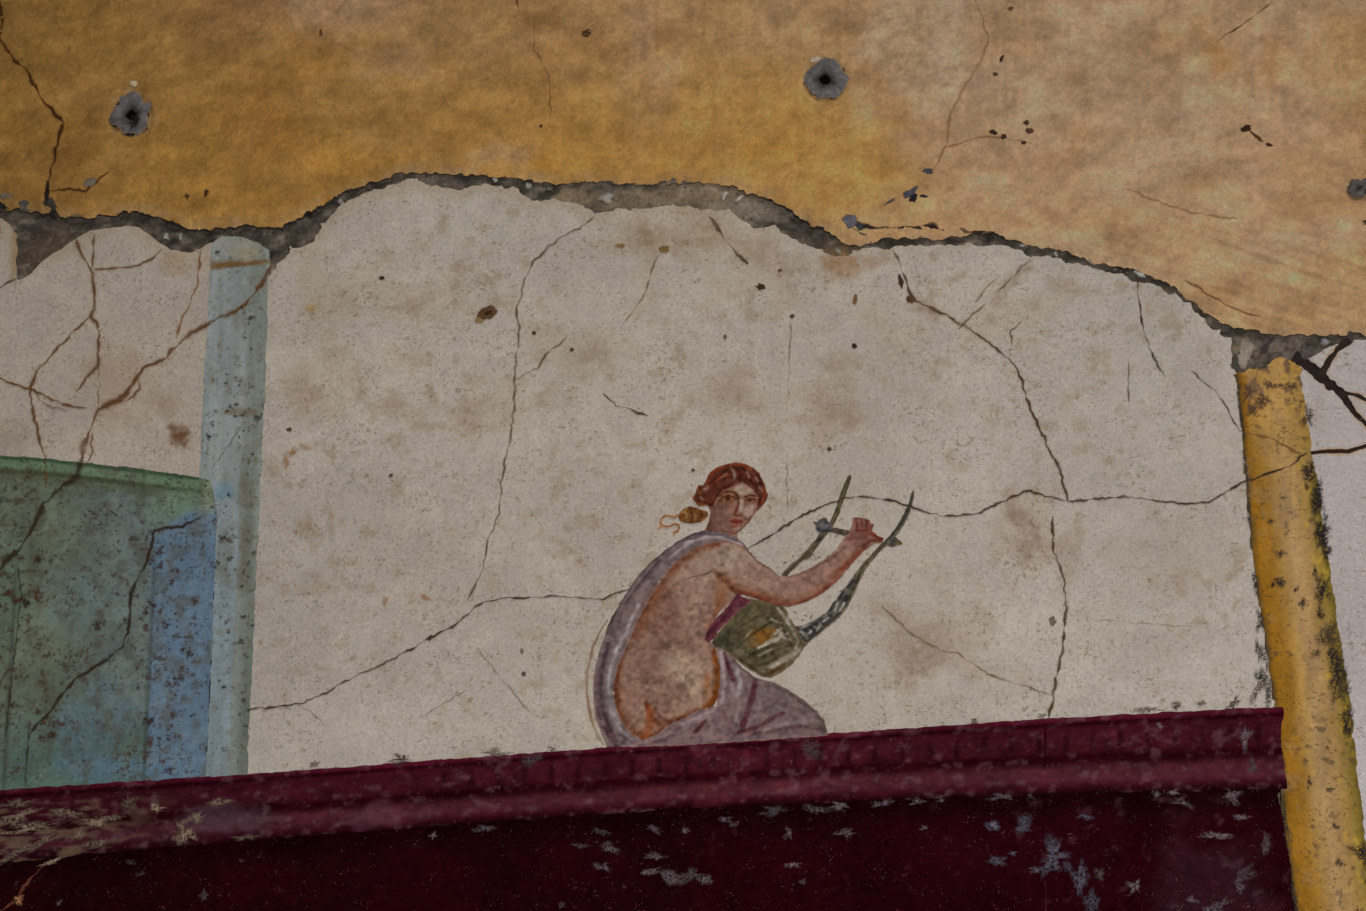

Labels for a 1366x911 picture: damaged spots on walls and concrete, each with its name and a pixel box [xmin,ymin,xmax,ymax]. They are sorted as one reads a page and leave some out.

crack [0,2,109,192]
flaking render [1241,125,1273,146]
crack [625,260,656,321]
flaking render [0,168,1366,436]
crack [0,235,271,785]
crack [246,215,628,710]
crack [687,216,1366,769]
peeling [1226,610,1273,710]
peeling [1252,463,1353,736]
peeling [0,797,164,866]
peeling [641,853,711,884]
peeling [1030,840,1103,911]